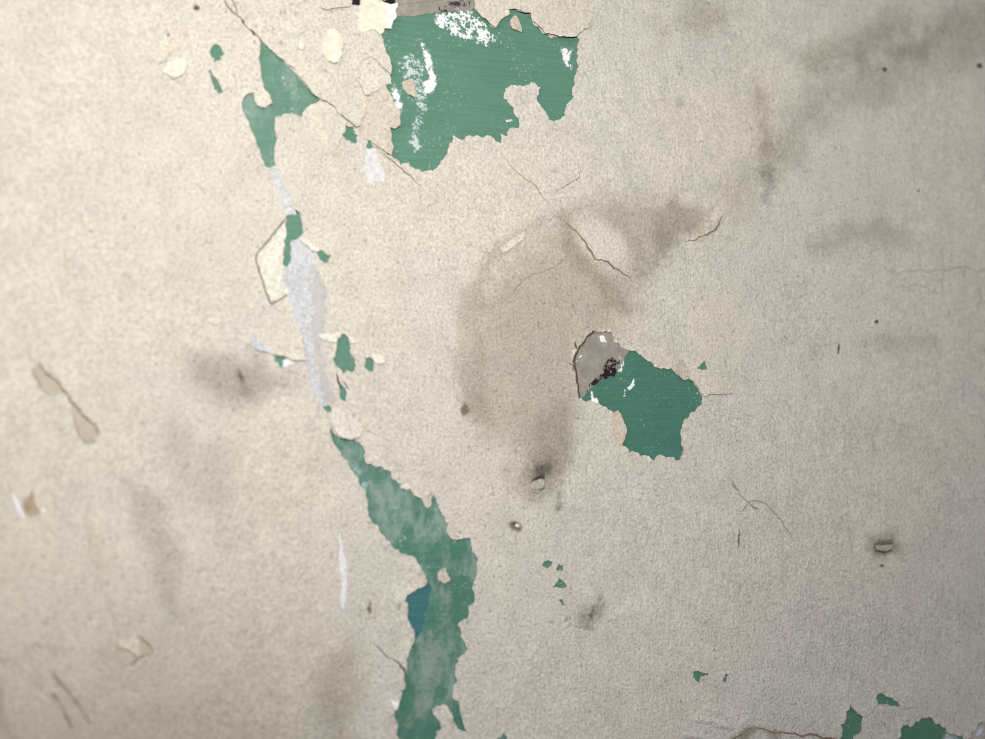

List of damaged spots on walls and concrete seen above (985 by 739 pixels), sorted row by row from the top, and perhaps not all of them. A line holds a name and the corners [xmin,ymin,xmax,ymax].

crack [495,159,631,304]
crack [683,213,725,242]
peeling [208,0,593,739]
peeling [569,330,732,461]
crack [732,727,835,739]
peeling [840,693,900,739]
peeling [899,717,985,739]